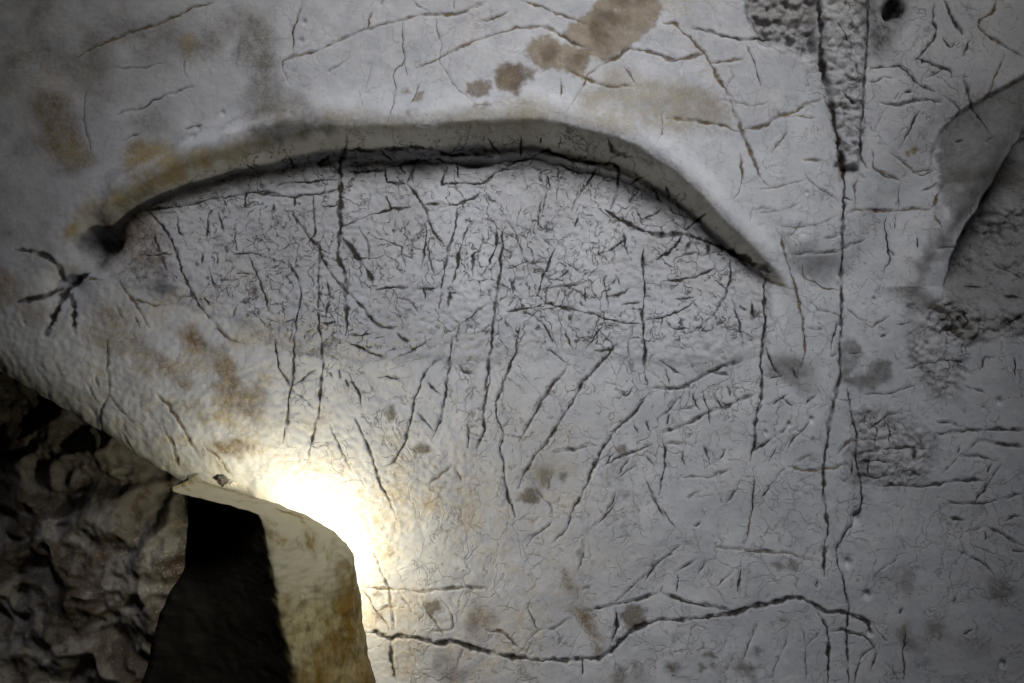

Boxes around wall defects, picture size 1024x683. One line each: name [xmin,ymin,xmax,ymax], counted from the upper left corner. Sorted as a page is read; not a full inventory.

damp [467,0,662,96]
crack [816,1,849,80]
crack [18,249,159,328]
crack [90,344,226,469]
crack [134,93,1023,682]